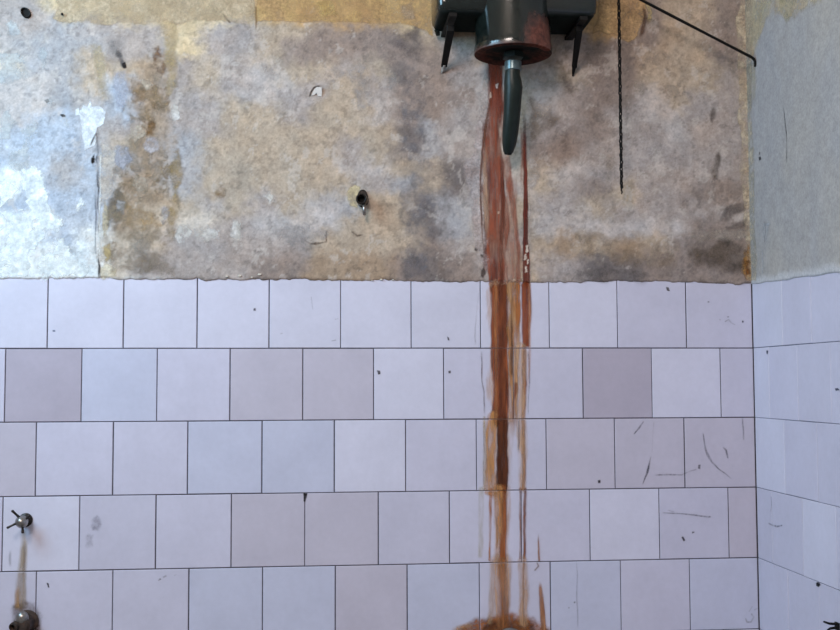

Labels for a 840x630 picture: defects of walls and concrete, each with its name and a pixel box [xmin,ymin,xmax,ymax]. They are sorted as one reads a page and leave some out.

peeling [0,166,89,280]
peeling [75,102,115,230]
water stain [108,79,180,271]
corrosion [456,64,548,630]